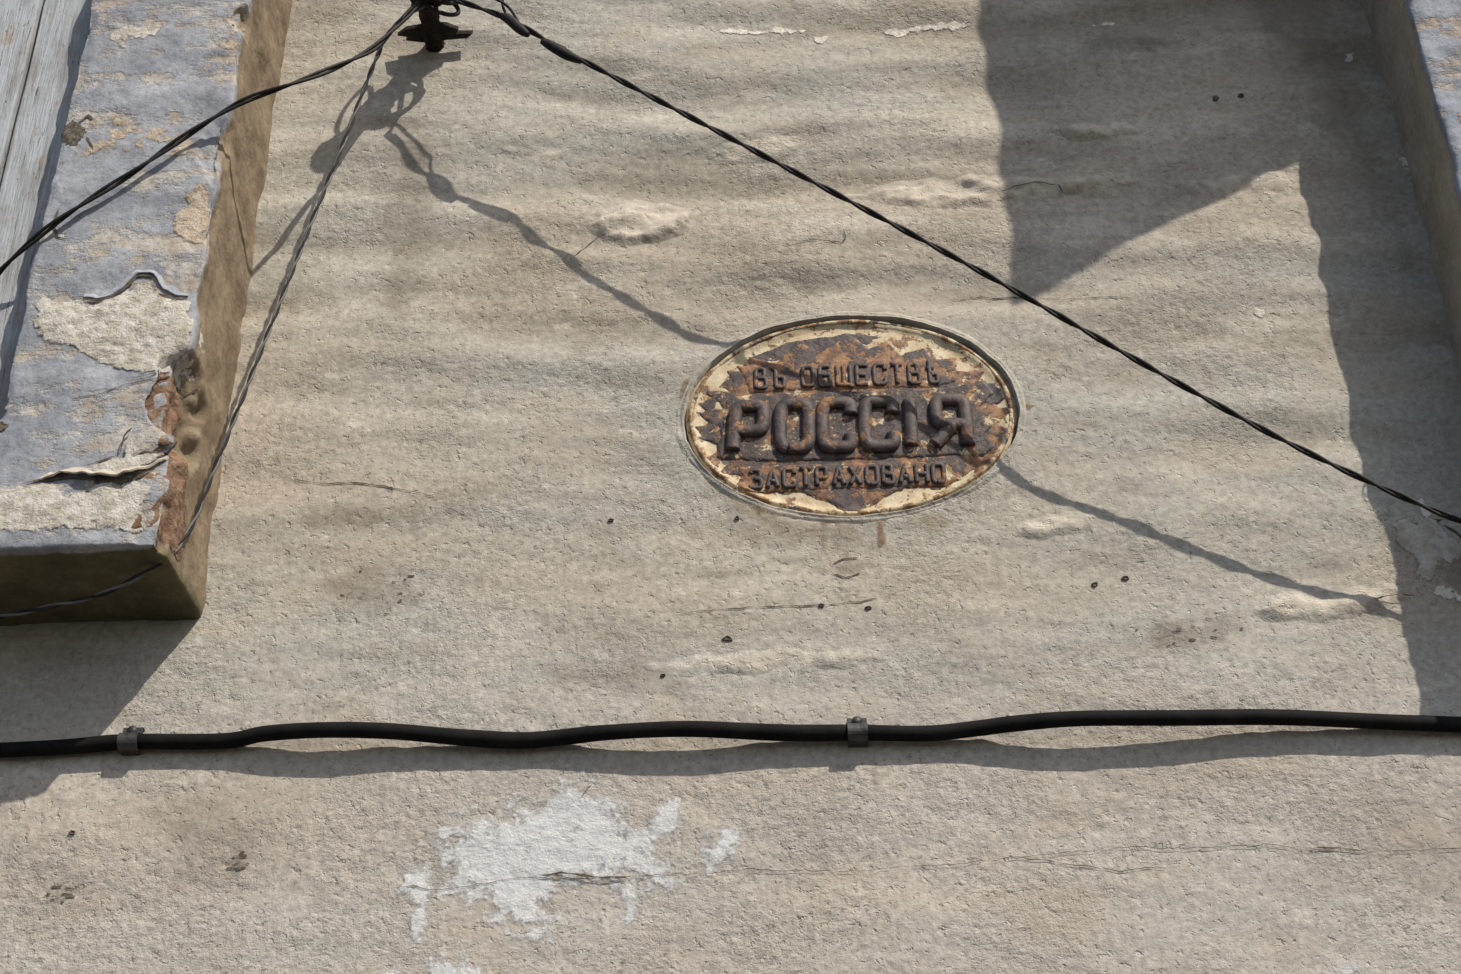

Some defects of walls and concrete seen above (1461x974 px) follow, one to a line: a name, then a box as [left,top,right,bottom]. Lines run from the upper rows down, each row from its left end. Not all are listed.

peeling [0,269,204,560]
peeling [397,770,687,974]
peeling [699,827,743,877]